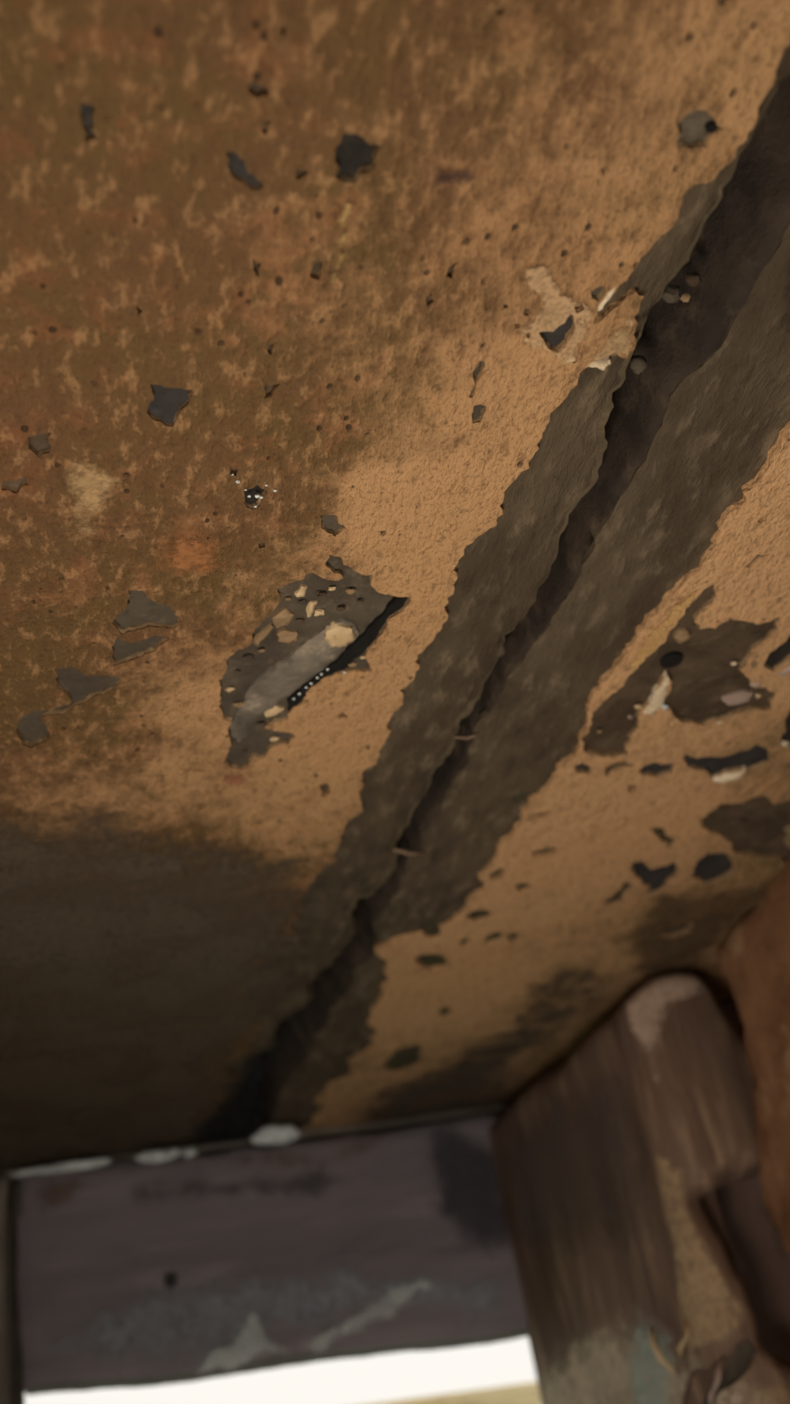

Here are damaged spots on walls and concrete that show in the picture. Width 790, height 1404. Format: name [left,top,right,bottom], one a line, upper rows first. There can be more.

spalling [211,45,790,1129]
crack [238,76,790,1131]